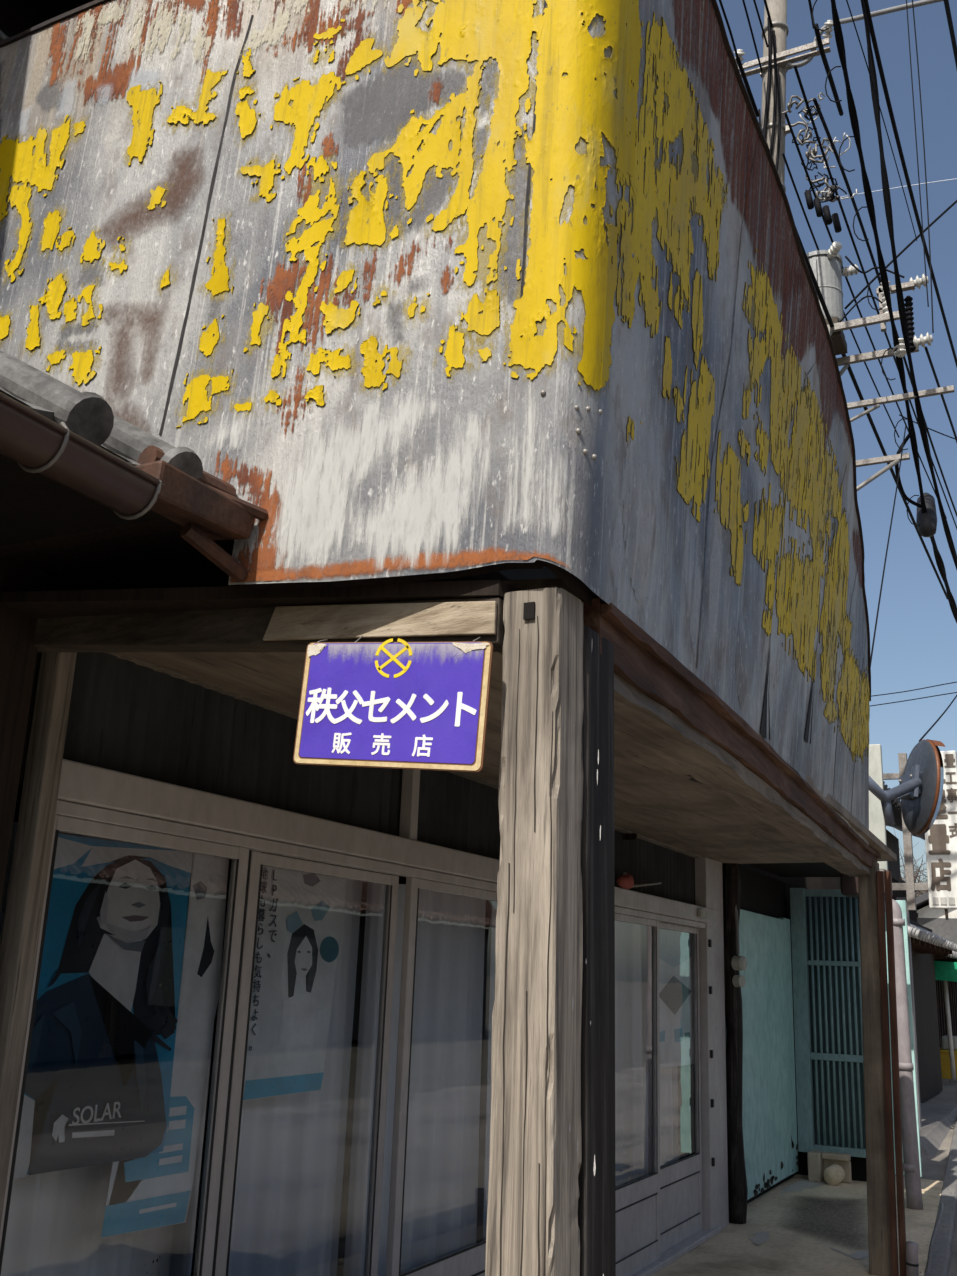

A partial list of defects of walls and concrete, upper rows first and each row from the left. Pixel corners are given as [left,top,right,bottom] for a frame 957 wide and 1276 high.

rust [46,0,244,105]
rust [266,0,374,86]
peeling [0,115,128,386]
peeling [74,0,870,763]
rust [214,450,568,583]